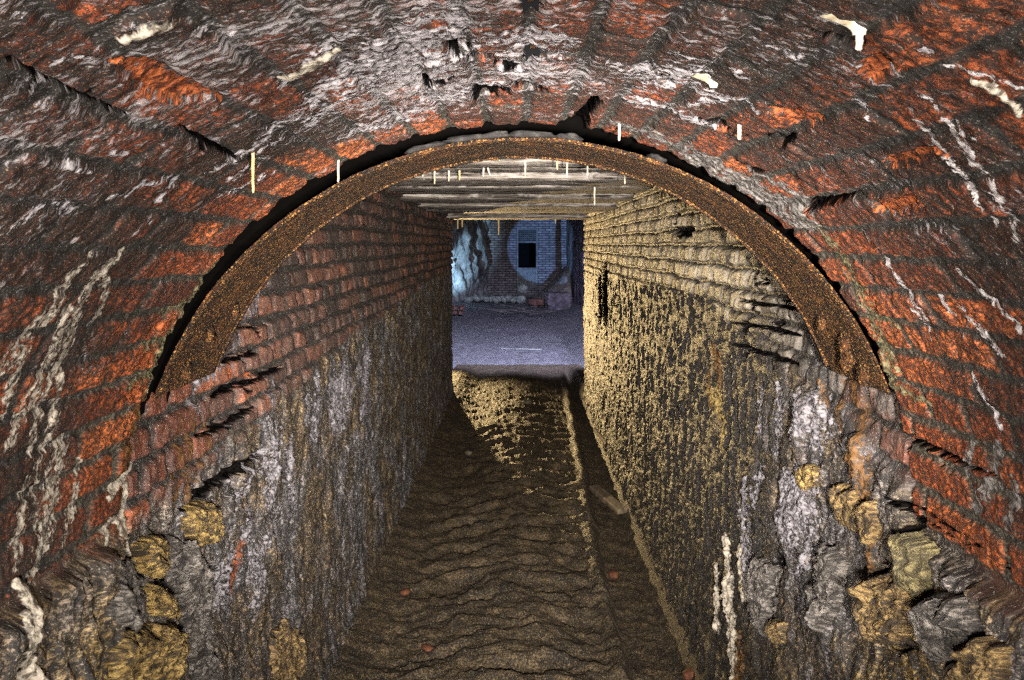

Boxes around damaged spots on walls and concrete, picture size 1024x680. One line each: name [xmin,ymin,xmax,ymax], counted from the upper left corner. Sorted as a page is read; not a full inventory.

crack [5,55,127,115]
spalling [441,37,549,101]
damp [765,42,805,61]
crack [178,124,249,160]
damp [937,294,1005,357]
damp [956,268,1022,335]
damp [0,246,132,680]
damp [712,563,721,633]
damp [736,545,747,602]